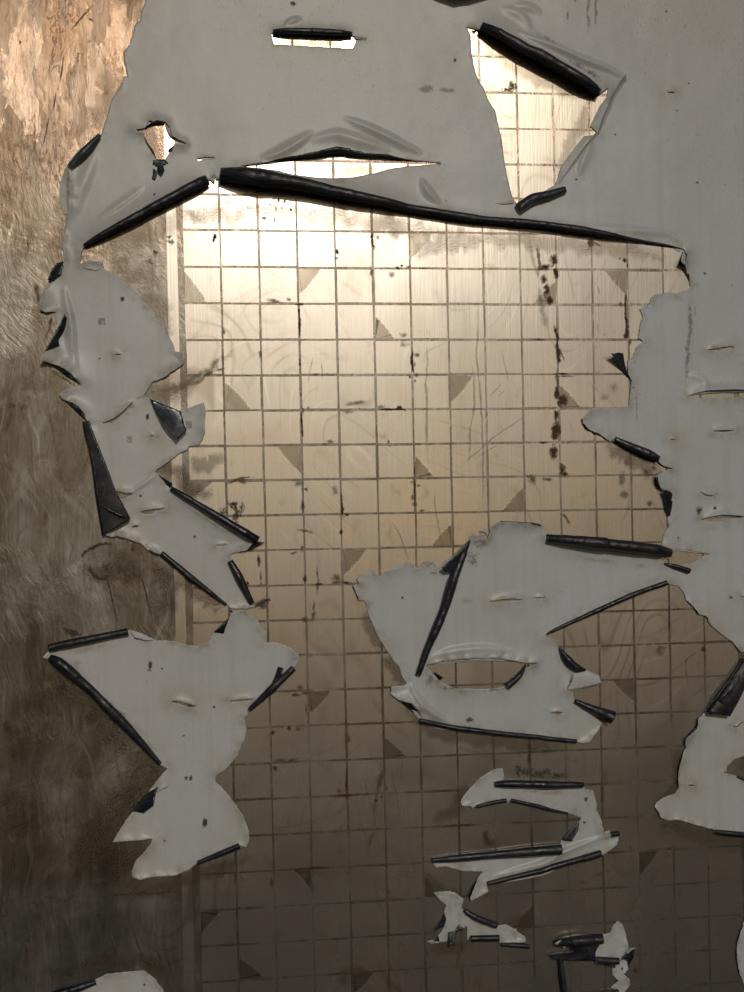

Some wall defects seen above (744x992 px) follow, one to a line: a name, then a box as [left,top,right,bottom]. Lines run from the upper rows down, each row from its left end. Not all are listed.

peeling [467,22,601,97]
peeling [68,134,101,196]
peeling [83,74,690,282]
rust [537,250,559,305]
peeling [65,401,130,535]
rust [527,327,569,482]
peeling [500,487,706,573]
peeling [416,524,526,689]
peeling [43,475,299,880]
peeling [425,768,620,949]
peeling [52,970,164,992]
peeling [549,921,635,992]